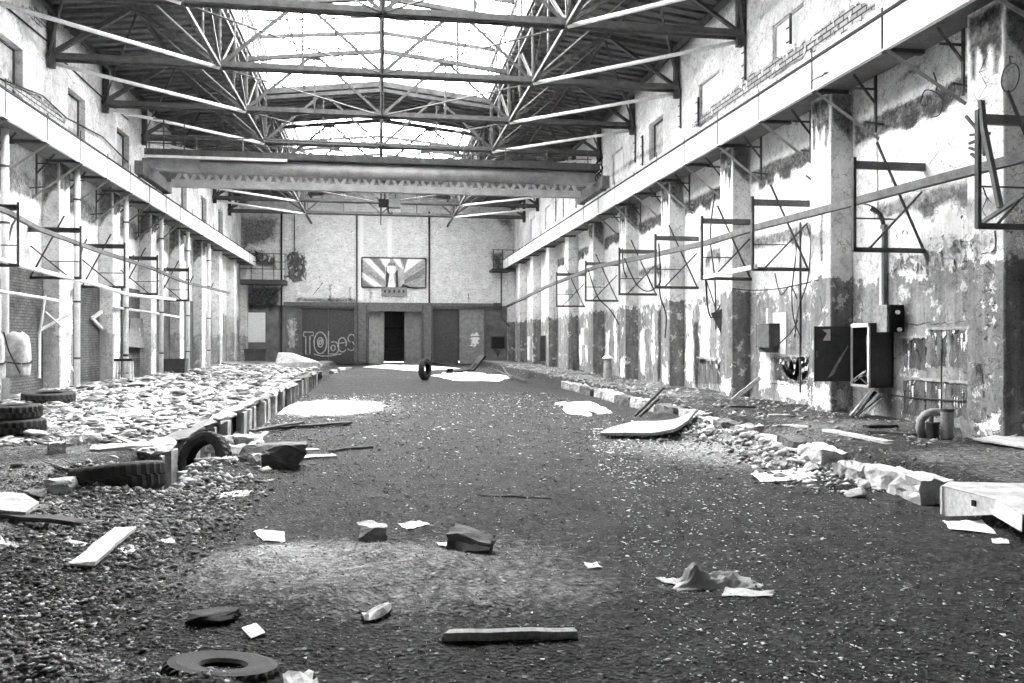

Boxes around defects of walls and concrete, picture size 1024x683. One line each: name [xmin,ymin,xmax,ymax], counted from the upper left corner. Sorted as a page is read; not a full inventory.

flaking render [692,1,879,128]
leakage [578,0,1024,261]
peeling [578,319,588,365]
peeling [605,318,625,378]
peeling [639,314,669,385]
peeling [683,303,731,396]
flaking render [900,326,1001,437]